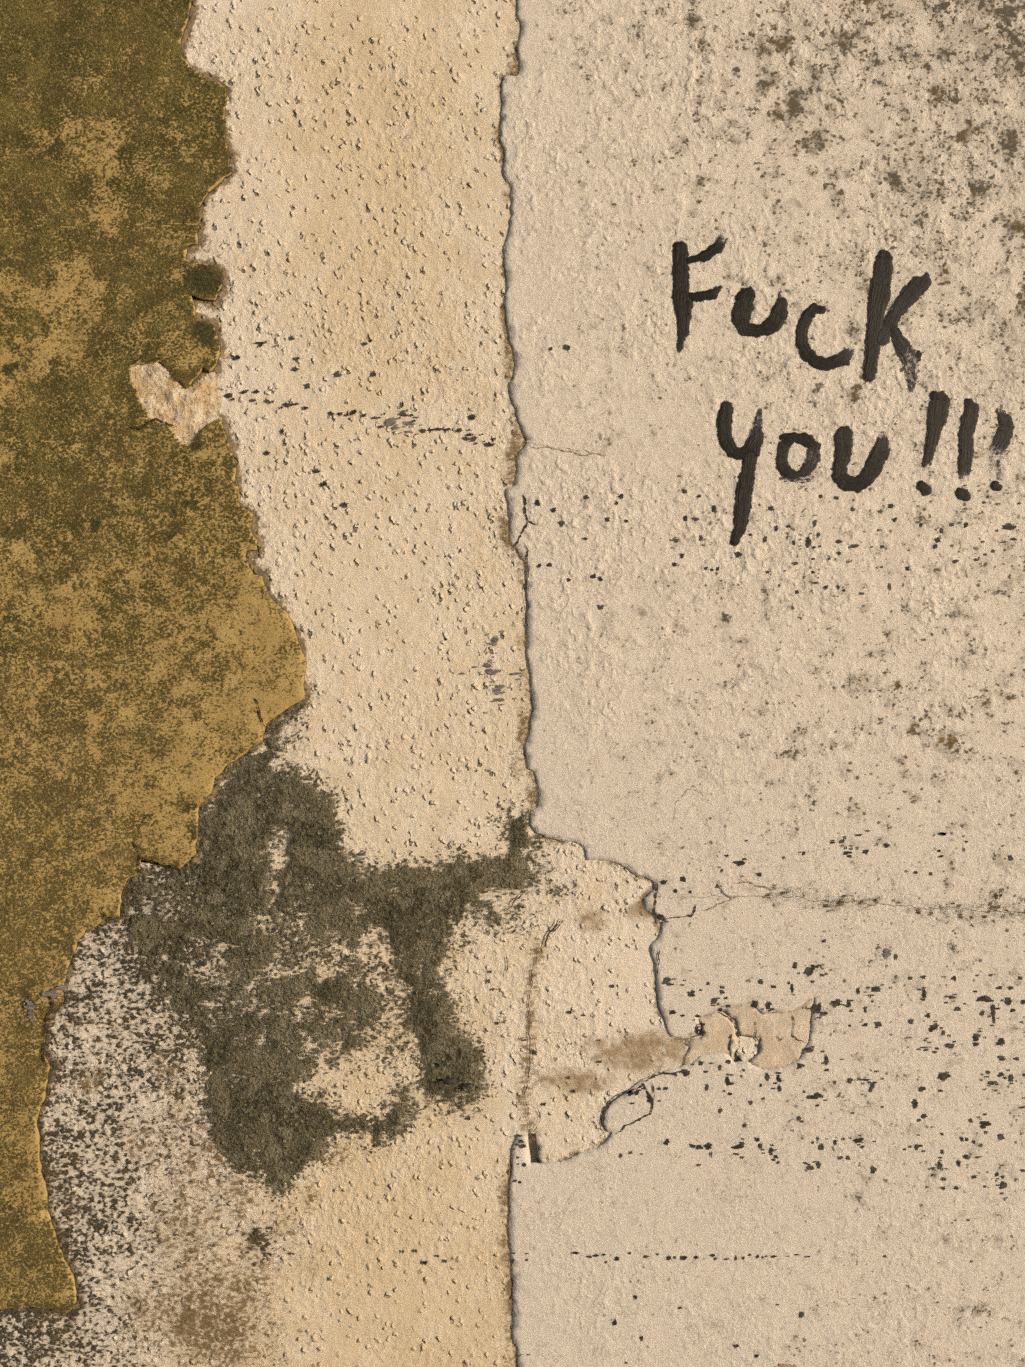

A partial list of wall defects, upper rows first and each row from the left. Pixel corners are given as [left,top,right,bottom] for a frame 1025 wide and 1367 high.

damp [599,0,1025,1048]
spalling [750,504,897,595]
damp [0,702,577,1367]
damp [541,1072,603,1092]
damp [587,1032,685,1070]
spalling [759,962,828,993]
spalling [909,975,956,1053]
spalling [945,974,1025,1109]
spalling [804,1135,876,1172]
spalling [904,1071,1007,1195]
spalling [572,1251,810,1263]
damp [873,1235,1024,1364]